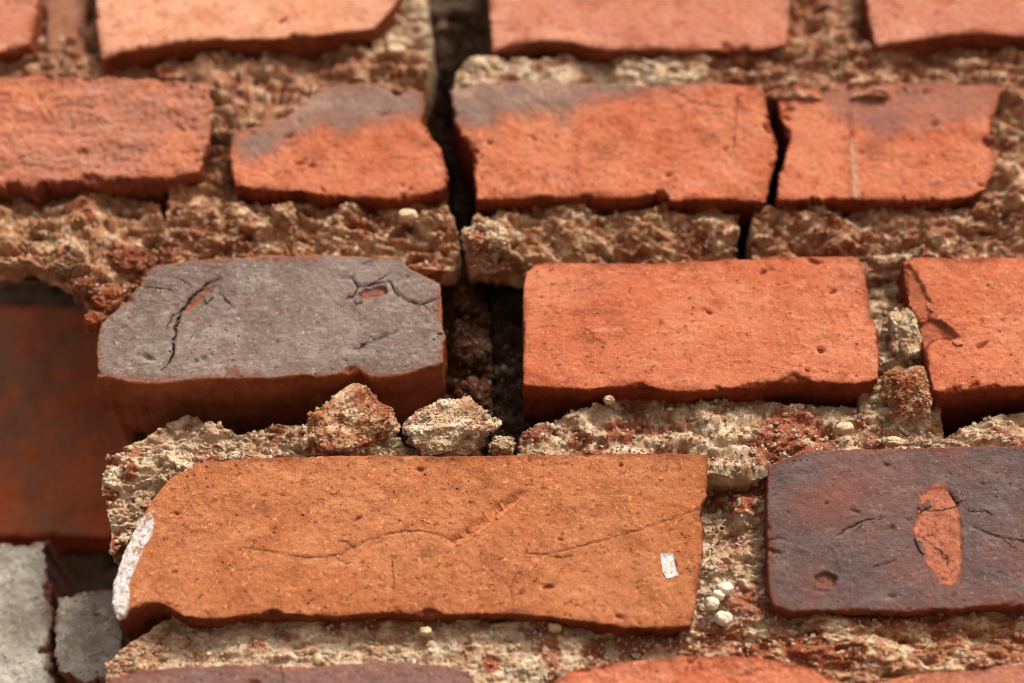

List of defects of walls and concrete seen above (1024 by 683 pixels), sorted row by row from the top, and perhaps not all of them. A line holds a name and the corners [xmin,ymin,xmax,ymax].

crack [427,67,476,247]
crack [736,165,778,260]
crack [143,279,234,371]
crack [342,258,436,312]
peeling [113,580,129,612]
crack [510,510,693,603]
crack [837,518,884,535]
spalling [913,483,963,587]
crack [964,508,1024,548]